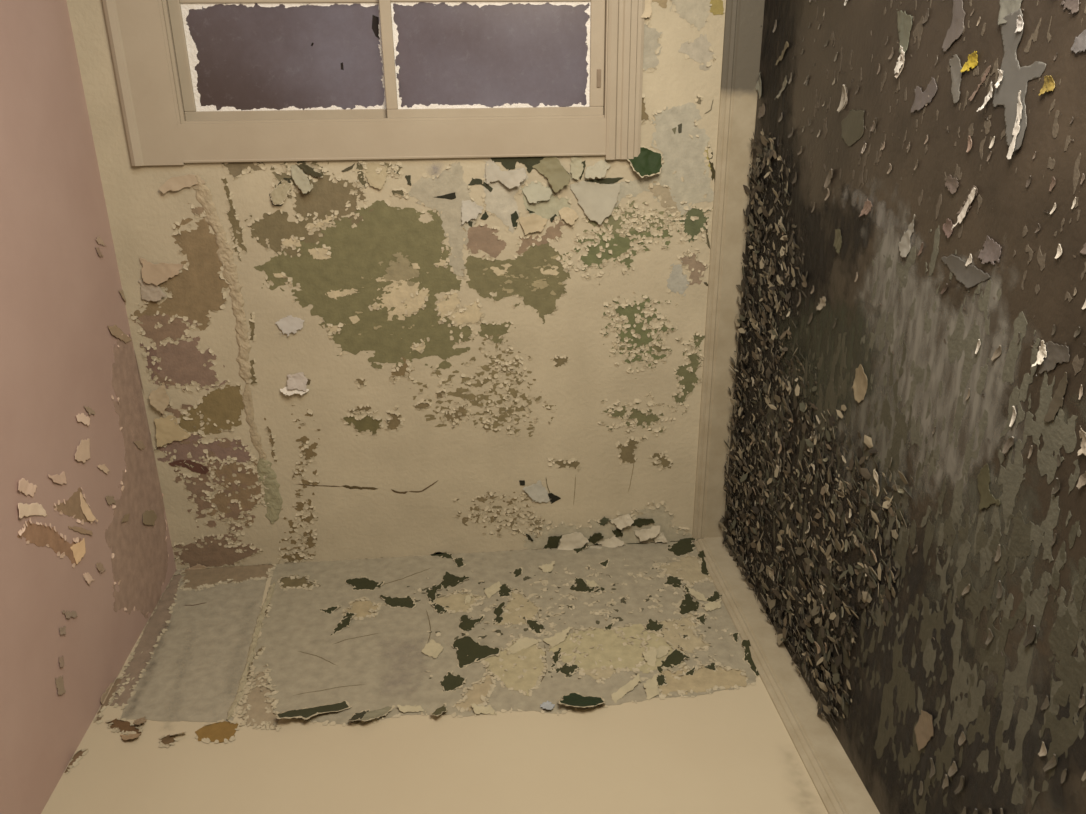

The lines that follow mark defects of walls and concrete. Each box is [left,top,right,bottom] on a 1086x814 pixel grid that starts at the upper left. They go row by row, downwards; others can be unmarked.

flaking render [641,0,725,73]
peeling [896,9,913,54]
peeling [1060,0,1081,14]
peeling [1071,30,1086,54]
peeling [911,77,937,113]
peeling [942,0,1055,153]
peeling [942,174,978,238]
peeling [898,214,915,258]
peeling [941,235,1002,289]
peeling [17,94,760,748]
peeling [852,364,868,403]
leakage [728,0,1086,814]